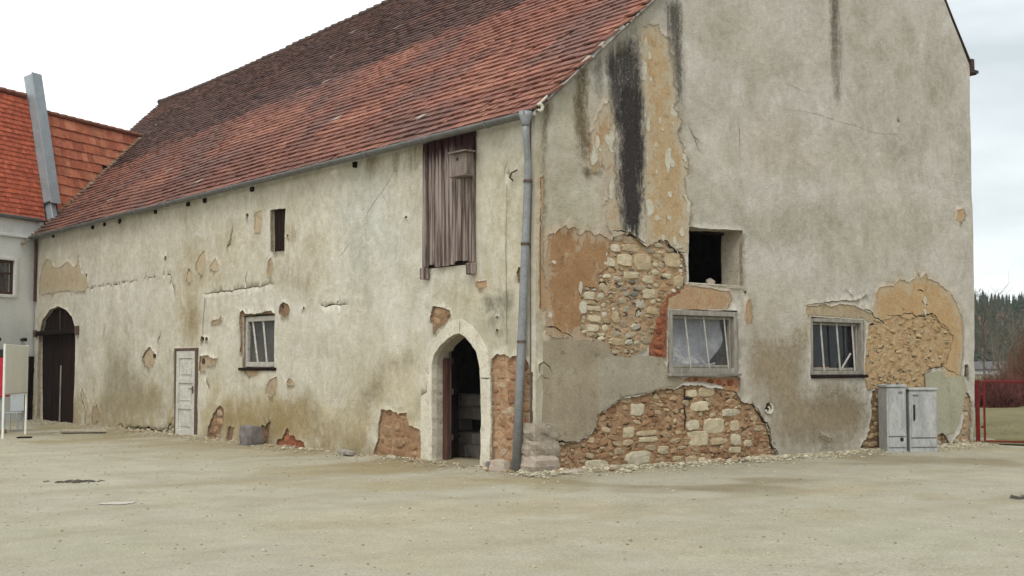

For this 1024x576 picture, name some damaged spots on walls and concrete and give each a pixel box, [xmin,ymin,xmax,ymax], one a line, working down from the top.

leakage [609,39,644,235]
peeling [640,24,691,254]
peeling [40,259,88,294]
peeling [648,284,731,358]
peeling [806,273,966,377]
spalling [144,347,156,367]
spalling [209,406,234,440]
spalling [261,422,305,448]
spalling [376,410,421,459]
spalling [493,354,560,473]
flaking render [684,376,739,392]
spalling [862,389,879,449]